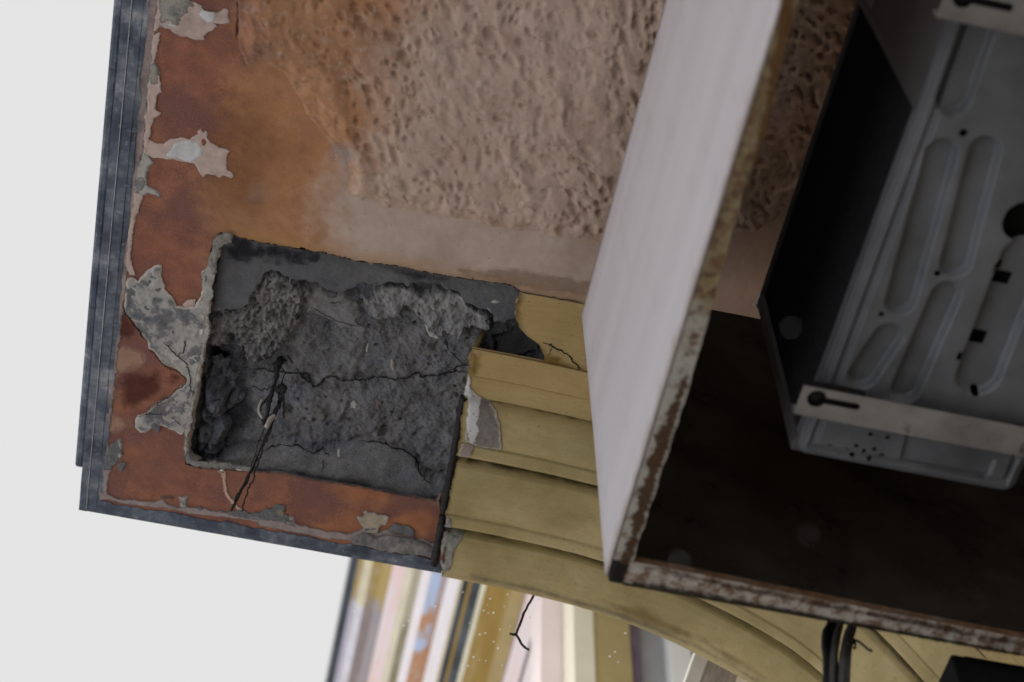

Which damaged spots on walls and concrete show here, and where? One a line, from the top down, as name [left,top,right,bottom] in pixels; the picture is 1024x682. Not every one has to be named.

spalling [98,0,544,571]
crack [244,339,469,387]
crack [264,444,331,472]
crack [361,440,433,484]
rust [620,374,1020,656]